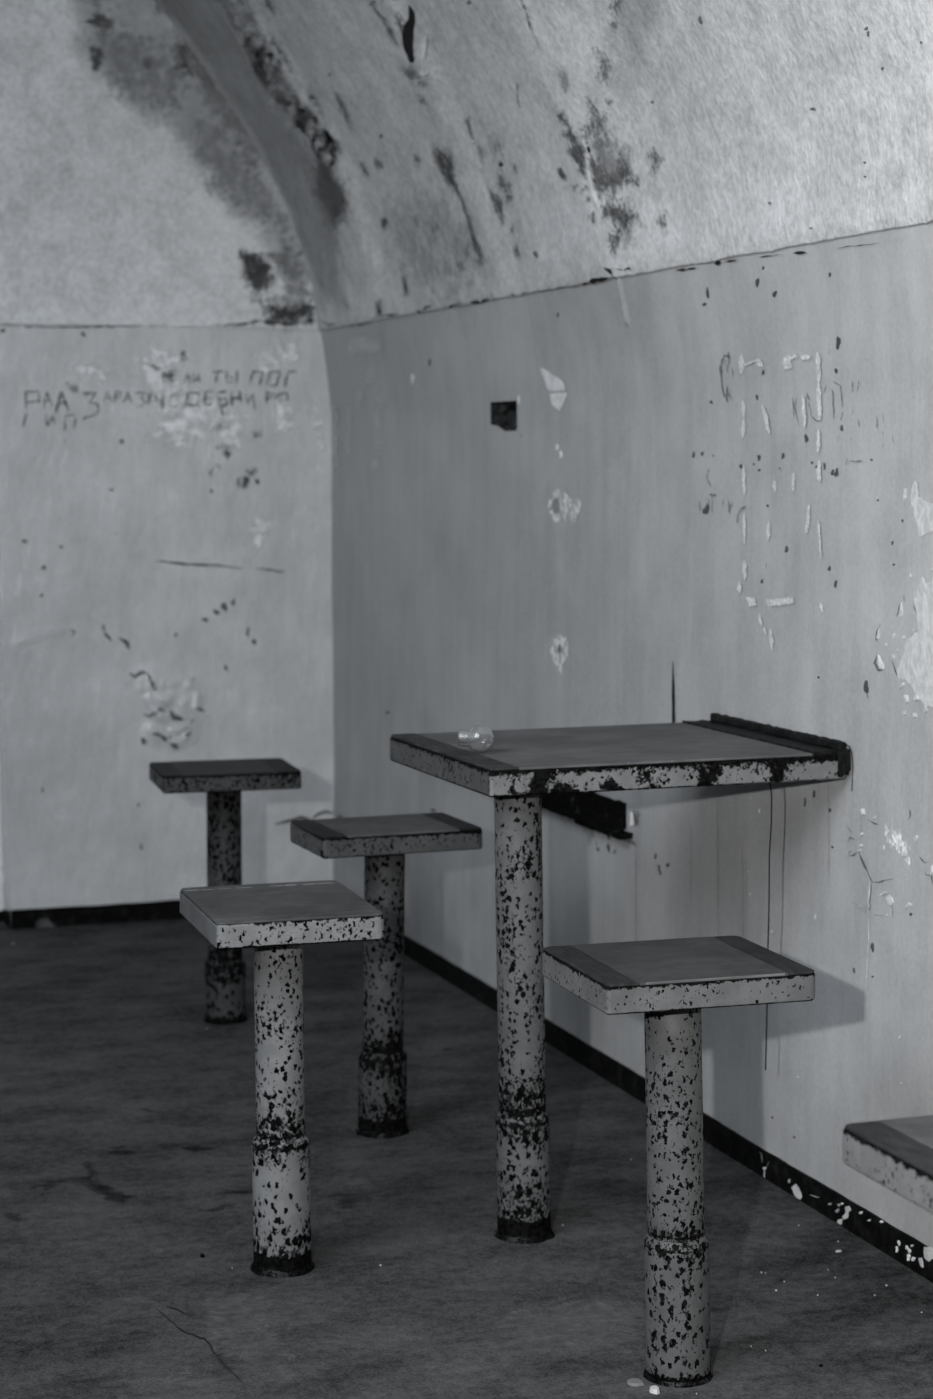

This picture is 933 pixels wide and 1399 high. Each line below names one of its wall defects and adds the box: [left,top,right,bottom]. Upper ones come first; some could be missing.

damp [315,156,347,226]
damp [556,99,662,254]
damp [238,249,316,325]
spalling [490,395,522,436]
peeling [540,367,567,411]
peeling [901,480,933,537]
peeling [863,568,933,717]
peeling [788,1179,884,1225]
peeling [896,1240,933,1268]